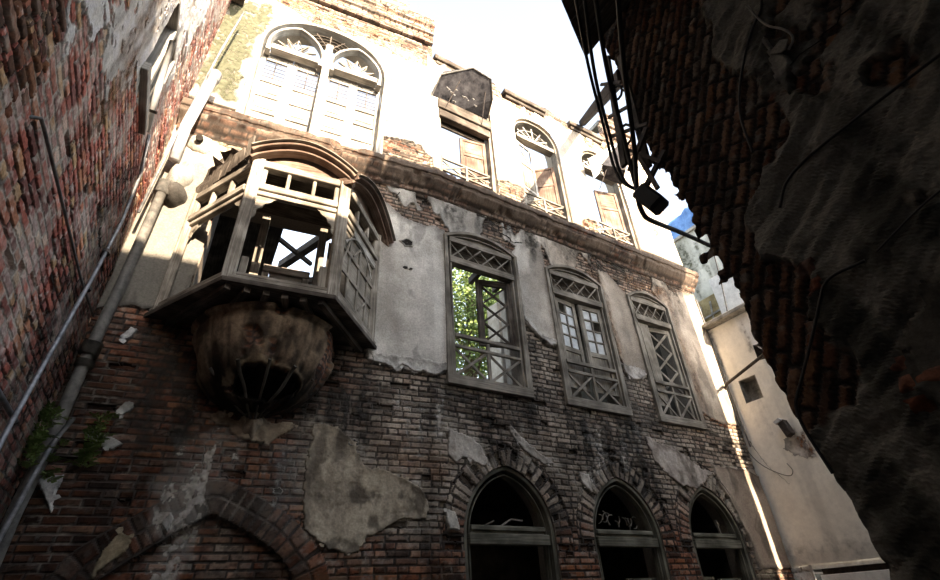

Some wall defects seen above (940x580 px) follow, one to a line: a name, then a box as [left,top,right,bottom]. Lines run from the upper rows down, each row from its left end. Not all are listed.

flaking render [0,0,66,118]
water stain [222,73,243,101]
flaking render [119,327,138,344]
flaking render [370,351,448,375]
flaking render [115,401,134,419]
flaking render [207,410,298,446]
flaking render [447,429,490,467]
flaking render [644,436,712,489]
flaking render [38,474,65,513]
flaking render [301,423,429,556]
flaking render [443,508,460,531]
flaking render [89,527,134,580]